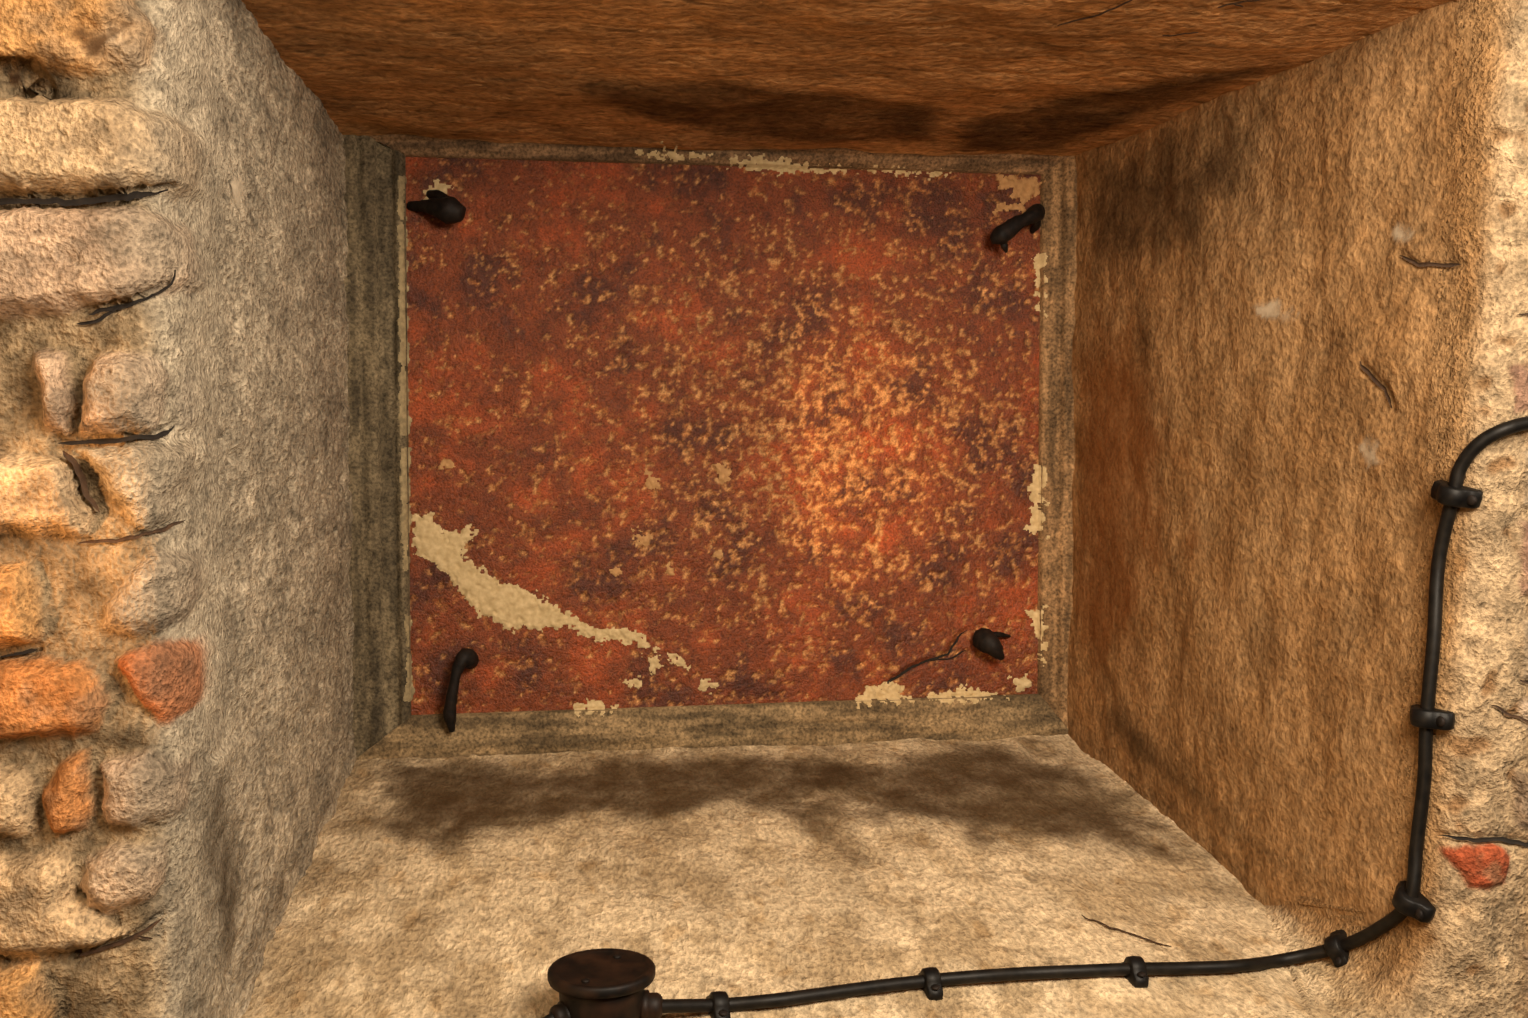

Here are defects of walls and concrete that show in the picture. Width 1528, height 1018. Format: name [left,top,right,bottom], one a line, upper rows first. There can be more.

damp [971,78,1220,148]
crack [0,189,168,206]
crack [77,269,176,325]
peeling [397,175,719,702]
peeling [712,462,732,485]
crack [881,630,967,690]
peeling [573,698,619,717]
damp [390,748,1166,851]
crack [1437,835,1528,847]